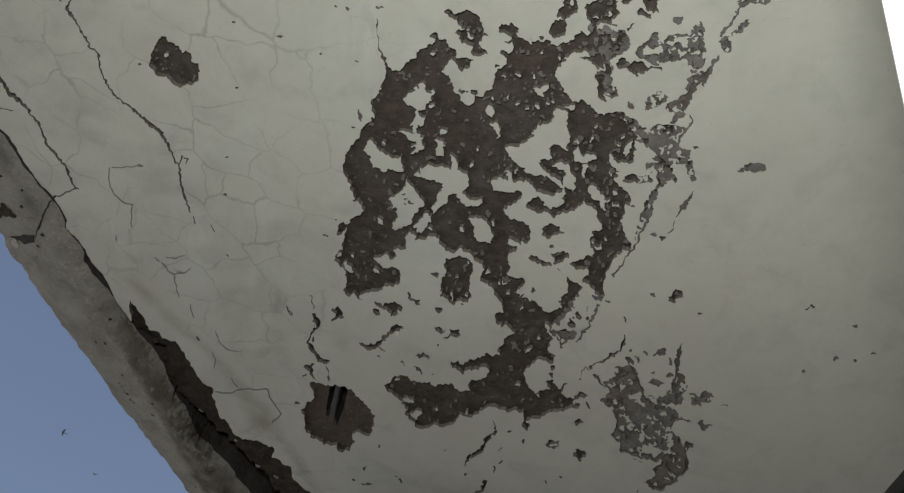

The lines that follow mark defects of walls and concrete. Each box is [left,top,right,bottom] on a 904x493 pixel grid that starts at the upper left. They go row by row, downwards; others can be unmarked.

spalling [139,36,200,85]
crack [108,164,143,242]
spalling [337,0,771,428]
spalling [131,303,311,493]
spalling [303,363,374,449]
spalling [594,345,714,489]